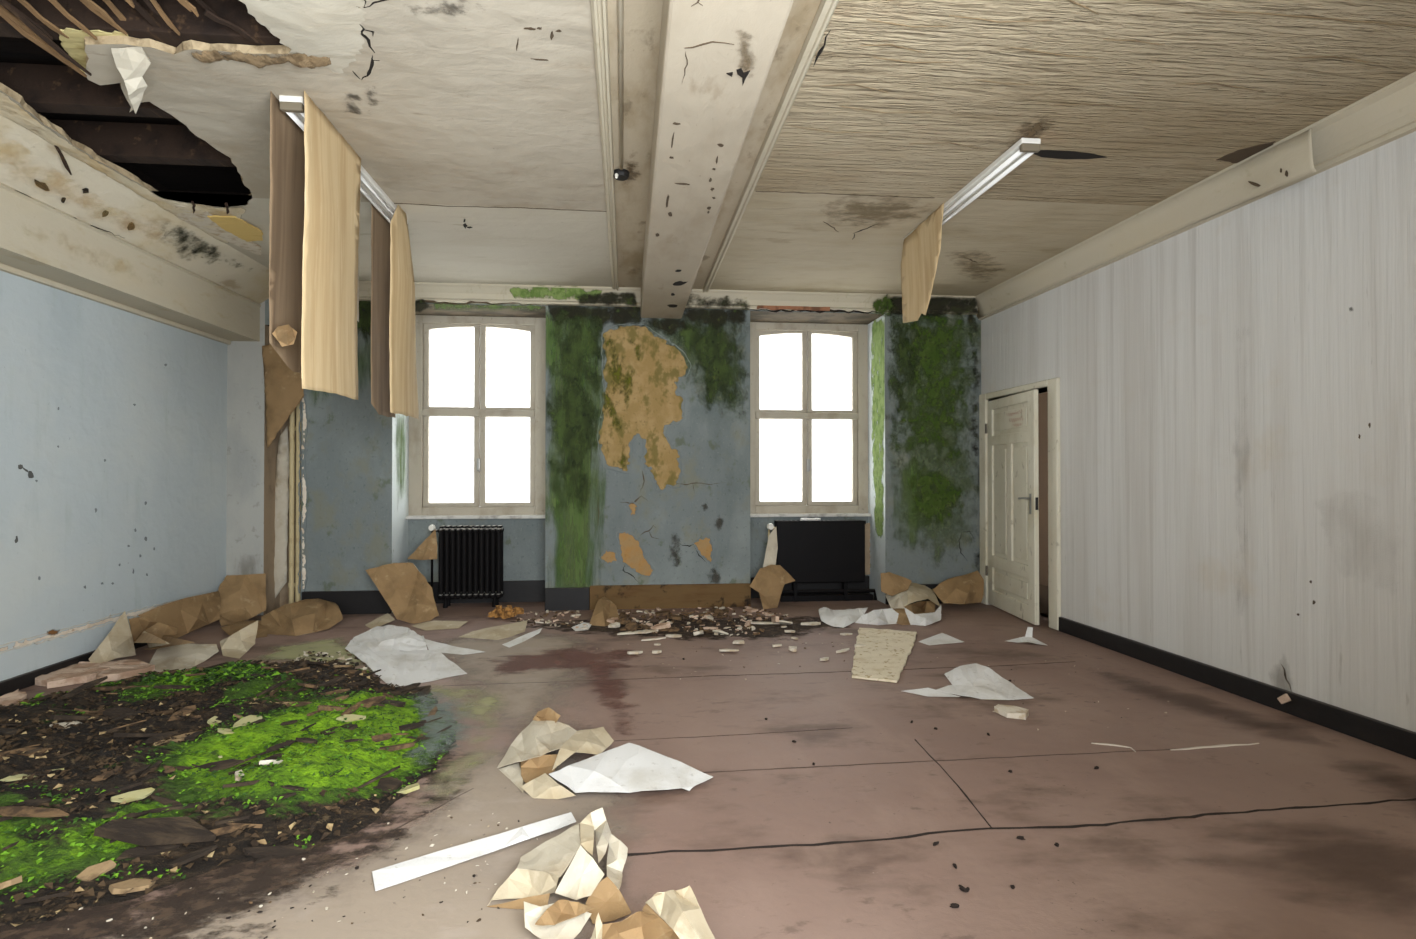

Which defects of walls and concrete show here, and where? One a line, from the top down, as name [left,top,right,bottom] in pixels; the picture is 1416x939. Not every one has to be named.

flaking render [111,46,151,114]
flaking render [191,50,331,69]
crack [353,0,387,80]
crack [682,41,734,82]
flaking render [0,92,262,256]
water stain [174,228,219,259]
water stain [890,296,902,315]
water stain [921,296,979,330]
peeling [597,323,691,493]
peeling [599,500,655,577]
peeling [691,536,713,565]